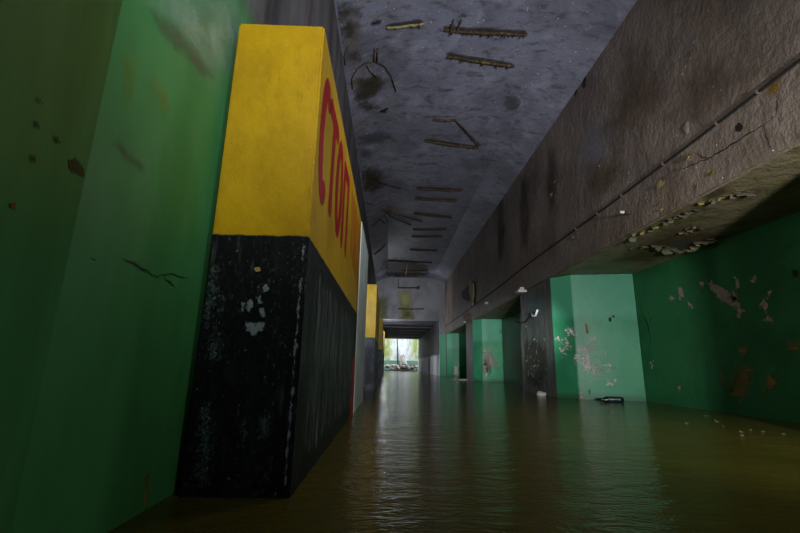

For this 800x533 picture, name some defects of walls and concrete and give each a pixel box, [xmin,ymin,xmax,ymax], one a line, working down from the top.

crack [682,93,778,169]
peeling [628,191,755,260]
crack [121,258,185,287]
peeling [240,284,269,336]
peeling [699,276,746,318]
peeling [524,328,622,399]